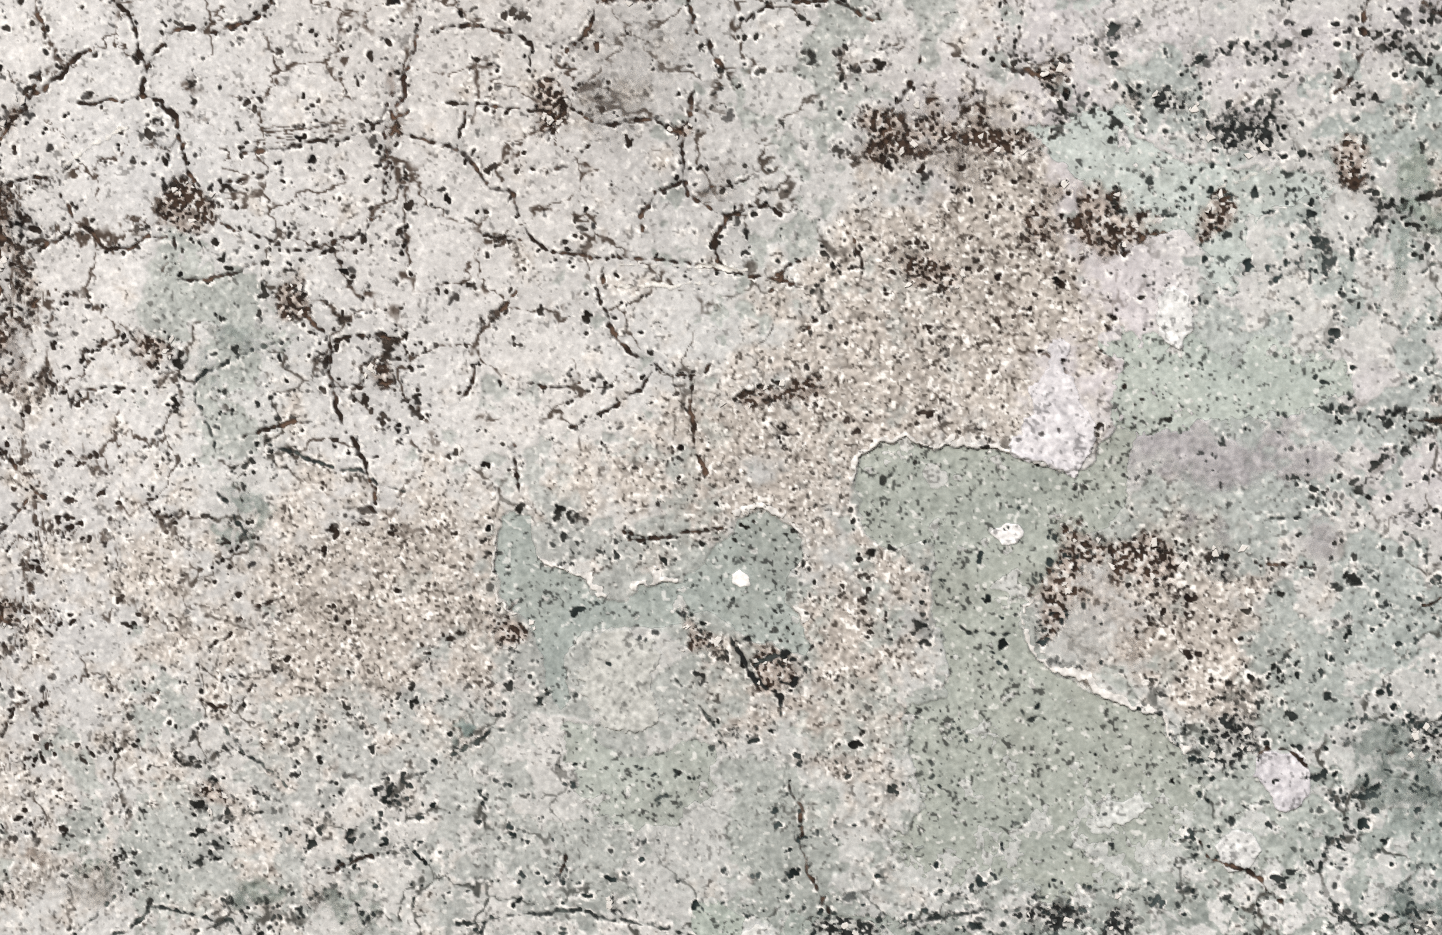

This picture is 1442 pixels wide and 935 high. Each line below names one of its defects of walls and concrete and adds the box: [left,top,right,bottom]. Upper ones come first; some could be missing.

crack [745,0,881,22]
crack [0,0,828,476]
crack [193,312,405,505]
spalling [720,374,823,410]
crack [622,527,724,543]
peeling [848,285,1354,935]
peeling [490,502,812,830]
crack [730,636,807,716]
crack [200,674,288,787]
crack [1199,840,1284,904]
crack [73,895,241,935]
crack [455,907,690,935]